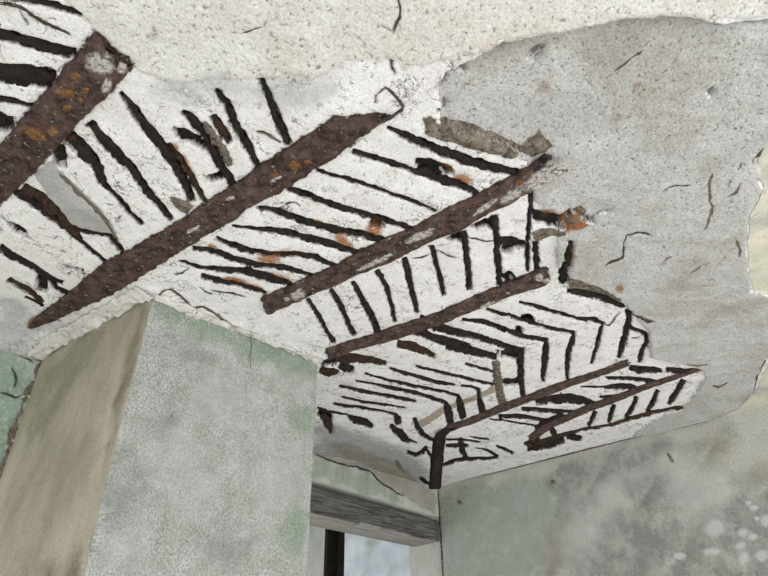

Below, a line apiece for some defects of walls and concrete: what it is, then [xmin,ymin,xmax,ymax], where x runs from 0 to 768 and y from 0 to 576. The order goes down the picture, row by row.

spalling [0,111,16,128]
spalling [38,275,53,289]
peeling [34,144,123,254]
rust [259,255,290,281]
spalling [65,0,768,437]
rust [541,210,586,231]
crack [605,232,652,266]
crack [704,148,764,231]
spalling [0,359,42,478]
crack [316,454,405,496]
peeling [313,453,437,513]
water stain [576,499,768,576]